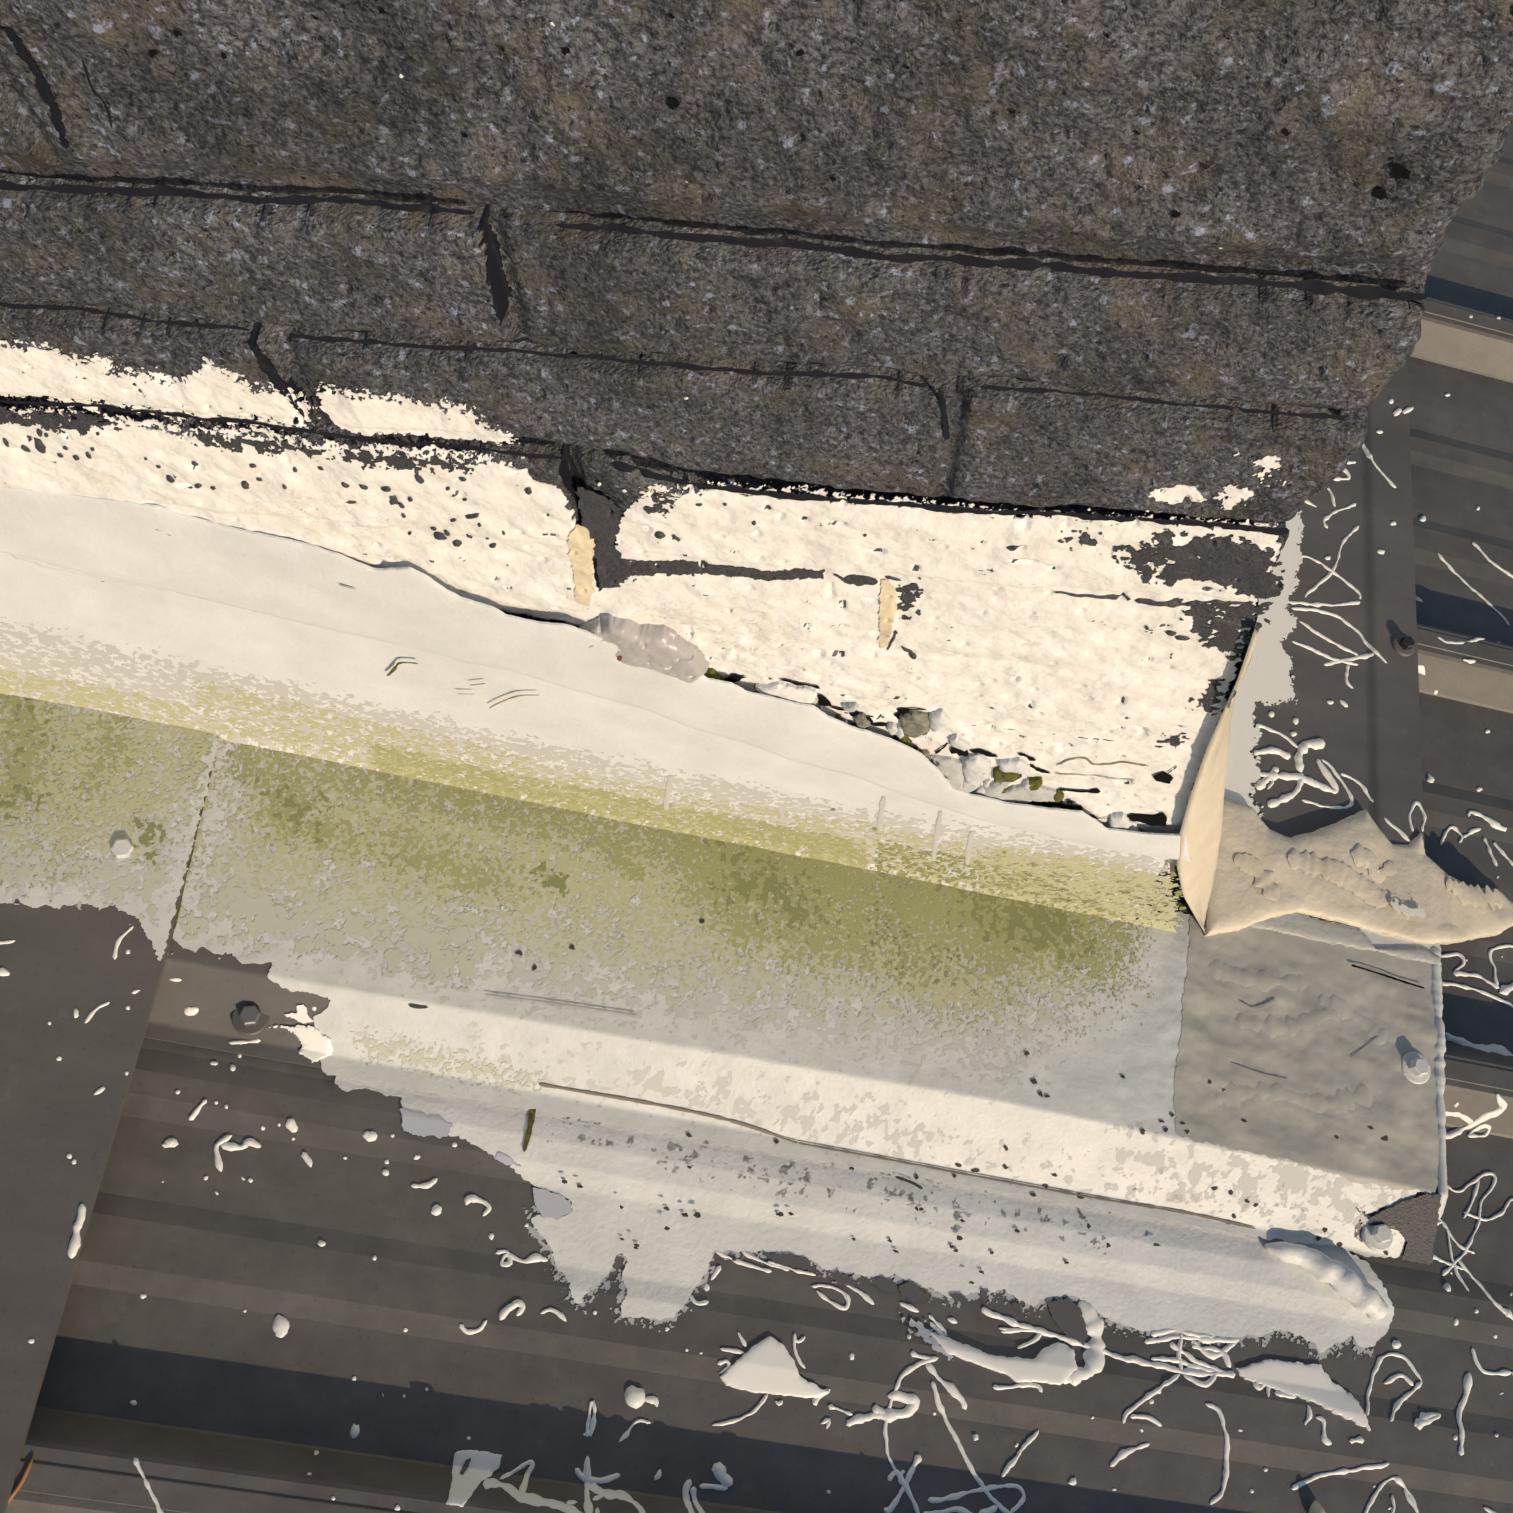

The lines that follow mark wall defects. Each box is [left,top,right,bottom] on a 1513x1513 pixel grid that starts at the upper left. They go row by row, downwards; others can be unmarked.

peeling [0,406,127,461]
peeling [187,426,505,548]
peeling [643,490,679,540]
crack [502,611,579,628]
crack [592,557,600,588]
peeling [885,576,924,660]
peeling [1058,526,1285,665]
crack [387,662,418,676]
crack [458,683,538,708]
peeling [1185,679,1232,716]
crack [781,679,1177,832]
damp [0,617,1411,1255]